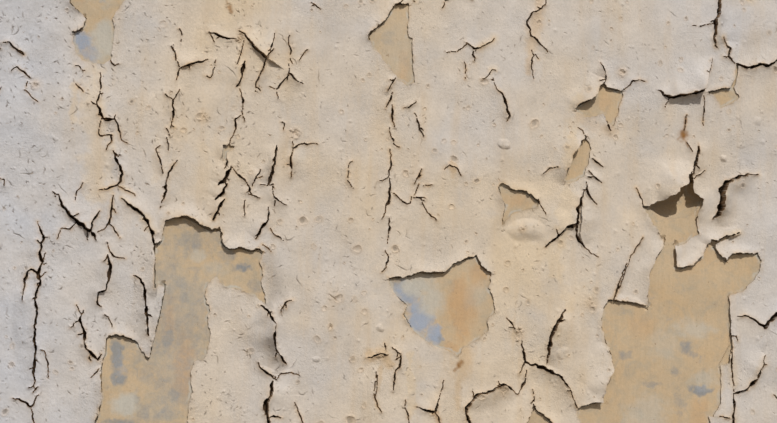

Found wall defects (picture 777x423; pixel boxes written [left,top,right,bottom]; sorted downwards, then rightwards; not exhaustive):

peeling [364,0,415,86]
crack [446,38,511,121]
crack [526,0,548,79]
peeling [572,76,624,126]
crack [12,28,318,423]
crack [379,76,462,272]
peeling [496,181,540,225]
peeling [88,206,266,423]
peeling [388,249,495,357]
crack [465,309,578,423]
peeling [577,168,761,423]
crack [719,303,777,423]